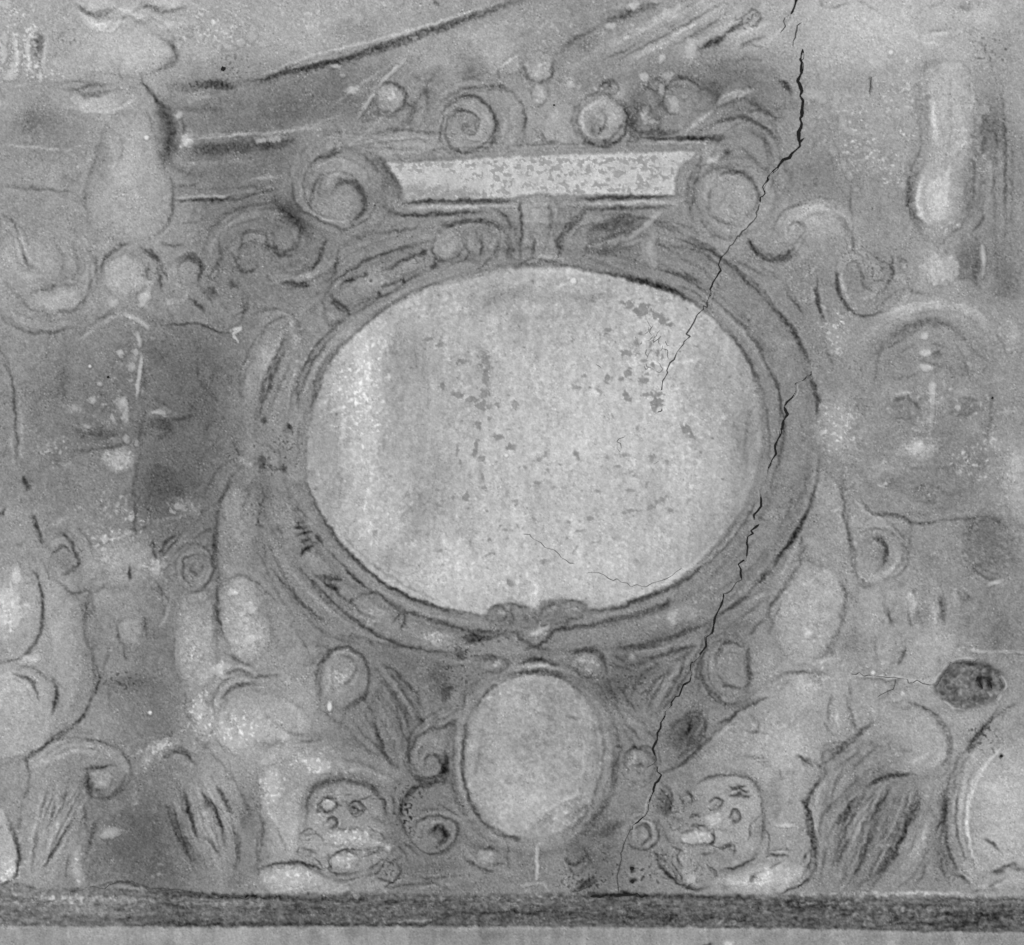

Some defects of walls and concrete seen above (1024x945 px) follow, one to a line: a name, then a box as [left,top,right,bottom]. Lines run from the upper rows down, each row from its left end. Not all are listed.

flaking render [624,0,673,20]
flaking render [637,51,689,115]
flaking render [681,41,700,79]
flaking render [640,107,661,127]
peeling [386,150,720,202]
crack [657,0,808,413]
peeling [566,297,676,414]
peeling [677,421,698,441]
crack [572,370,812,898]
crack [853,672,931,697]